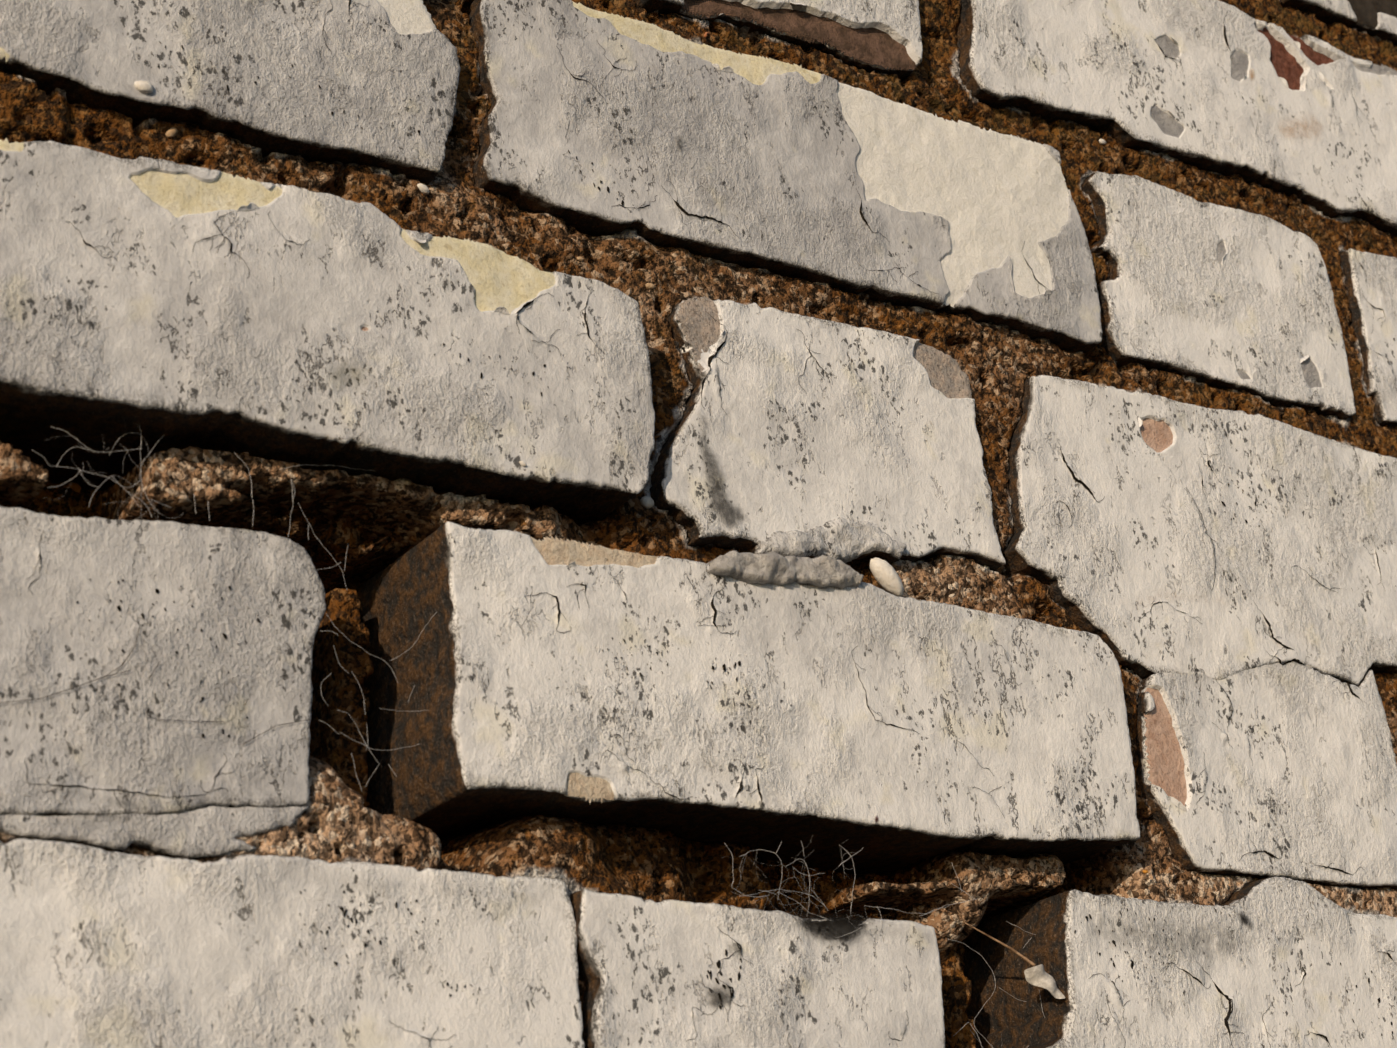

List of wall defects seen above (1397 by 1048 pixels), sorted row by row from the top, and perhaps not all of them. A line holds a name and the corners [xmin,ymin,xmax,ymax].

peeling [572,1,822,85]
spalling [682,0,917,71]
spalling [1257,27,1334,90]
peeling [1347,0,1397,29]
peeling [129,170,282,218]
peeling [837,82,1068,308]
peeling [400,229,555,315]
crack [1057,439,1104,528]
crack [1140,443,1223,624]
crack [1255,603,1366,703]
crack [1088,973,1128,1048]
crack [1166,962,1271,1048]